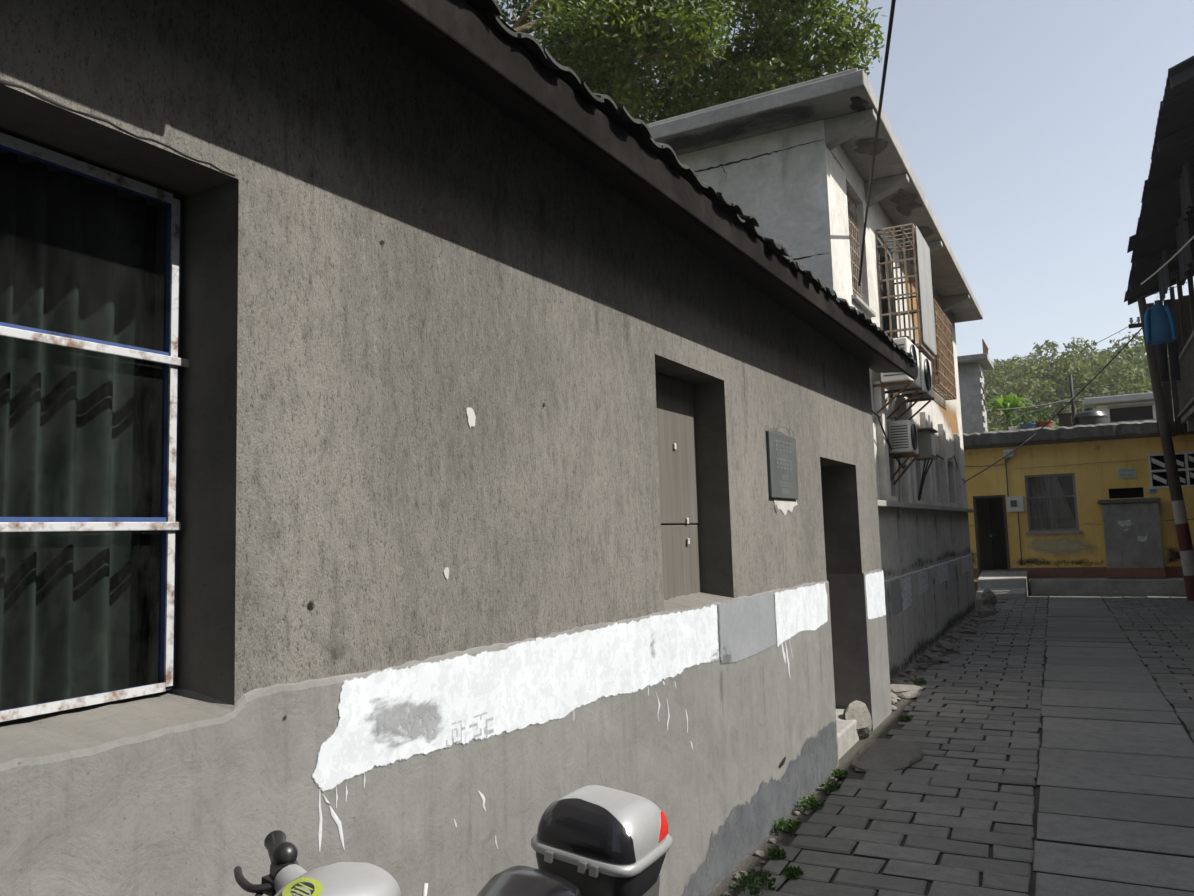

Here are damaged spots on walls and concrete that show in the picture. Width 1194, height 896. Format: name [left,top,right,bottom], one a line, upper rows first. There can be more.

crack [0,79,236,176]
crack [694,139,845,178]
leakage [682,722,838,896]